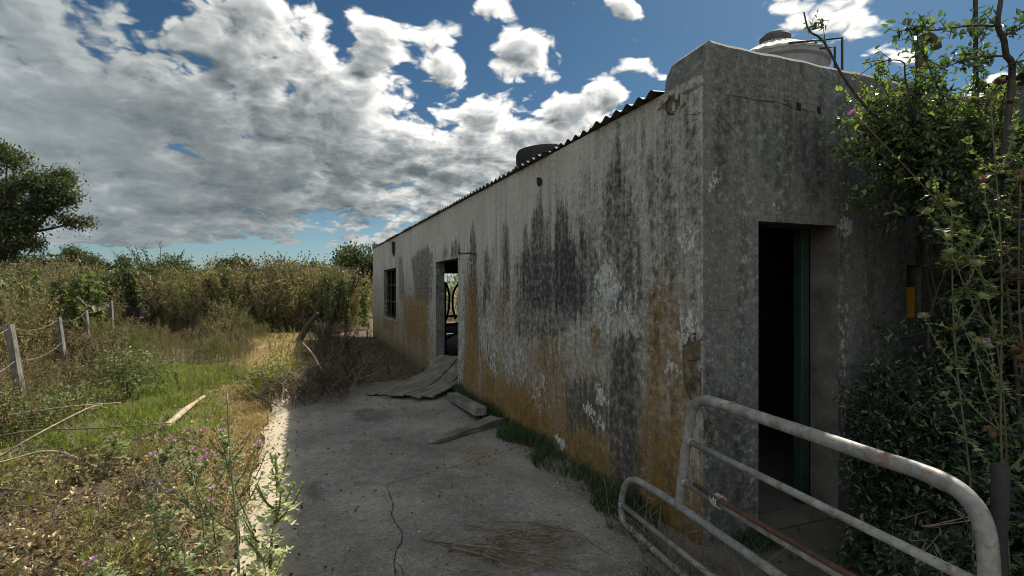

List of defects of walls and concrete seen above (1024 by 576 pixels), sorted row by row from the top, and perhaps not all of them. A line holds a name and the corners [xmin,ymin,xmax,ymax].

leakage [503,170,641,337]
rust [461,273,494,404]
rust [644,288,687,525]
flaking render [661,309,717,447]
crack [352,448,515,576]